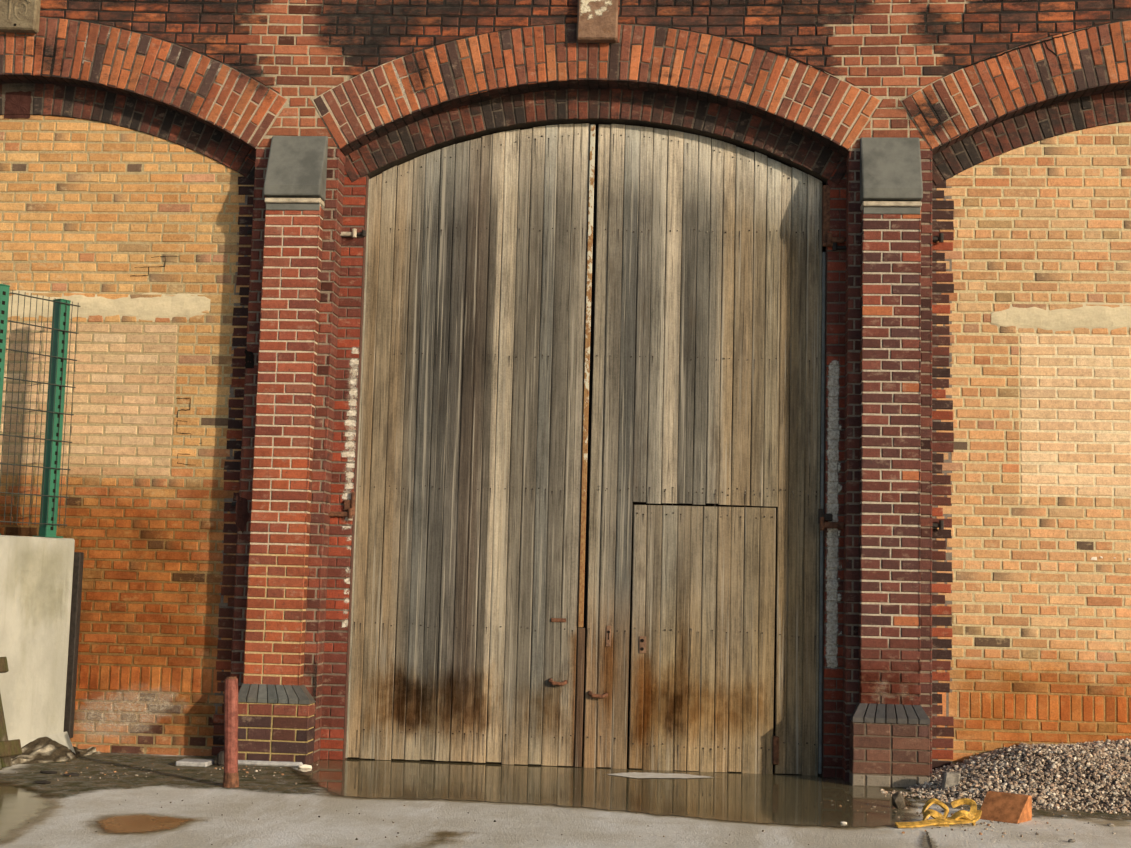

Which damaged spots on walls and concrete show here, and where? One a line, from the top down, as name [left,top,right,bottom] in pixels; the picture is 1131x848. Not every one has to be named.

crack [132,256,178,276]
crack [176,398,191,465]